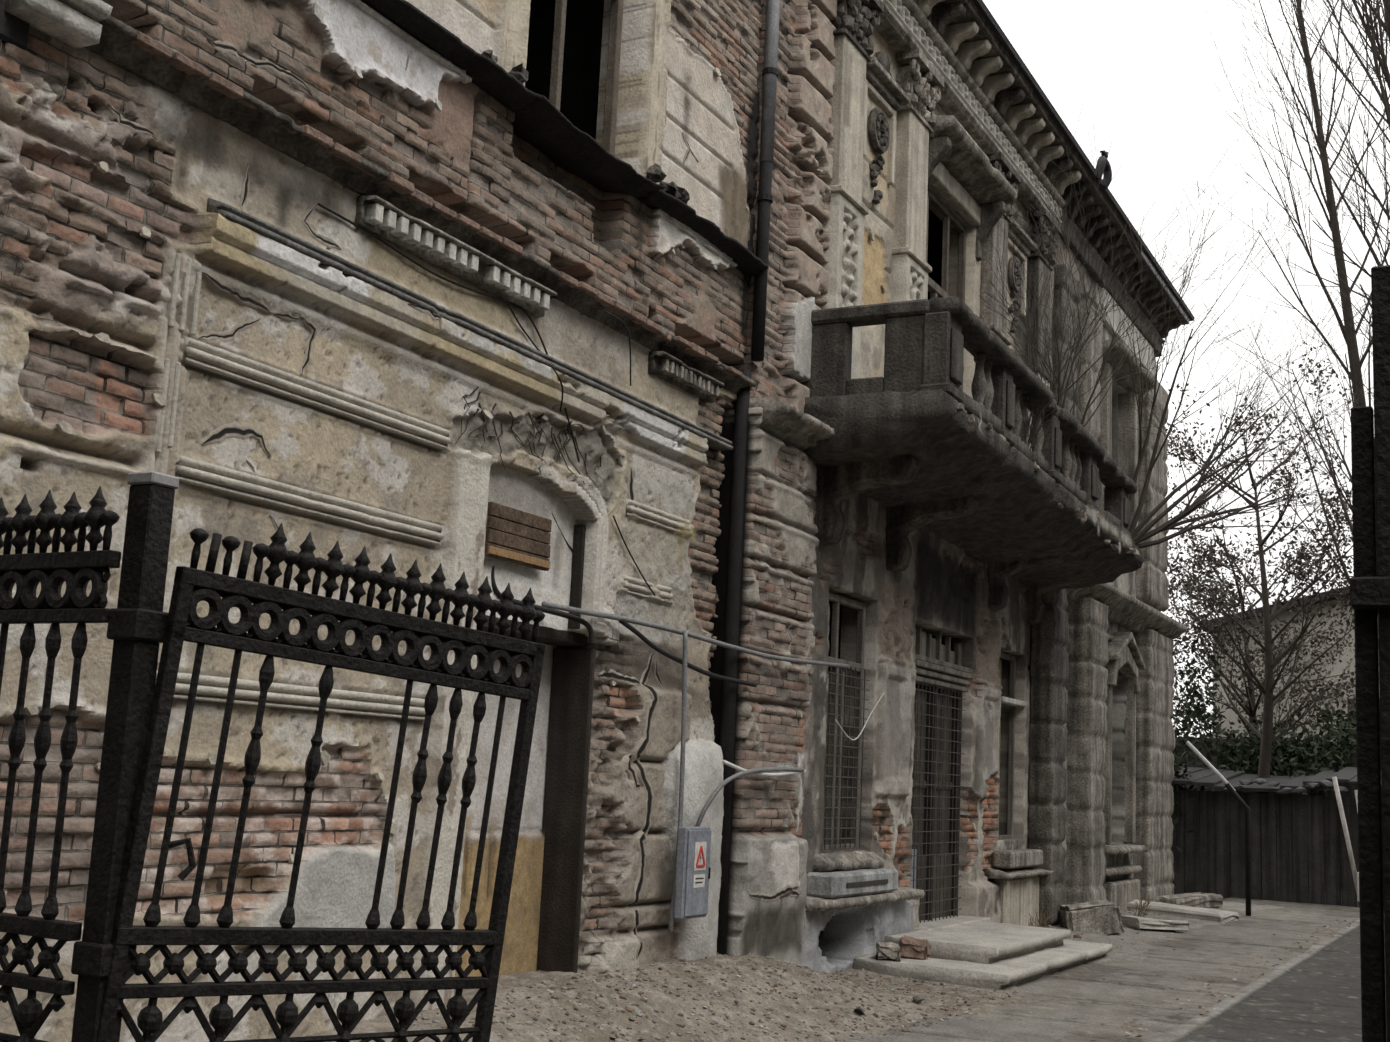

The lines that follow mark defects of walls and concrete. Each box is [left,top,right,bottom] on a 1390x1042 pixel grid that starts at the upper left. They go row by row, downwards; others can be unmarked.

peeling [308,0,466,111]
spalling [19,144,219,245]
crack [196,272,318,377]
spalling [18,328,167,436]
crack [201,423,272,476]
spalling [450,410,625,506]
spalling [605,681,643,739]
spalling [0,705,105,923]
spalling [135,744,398,916]
spalling [791,706,807,837]
spalling [871,803,919,900]
spalling [959,772,1000,883]